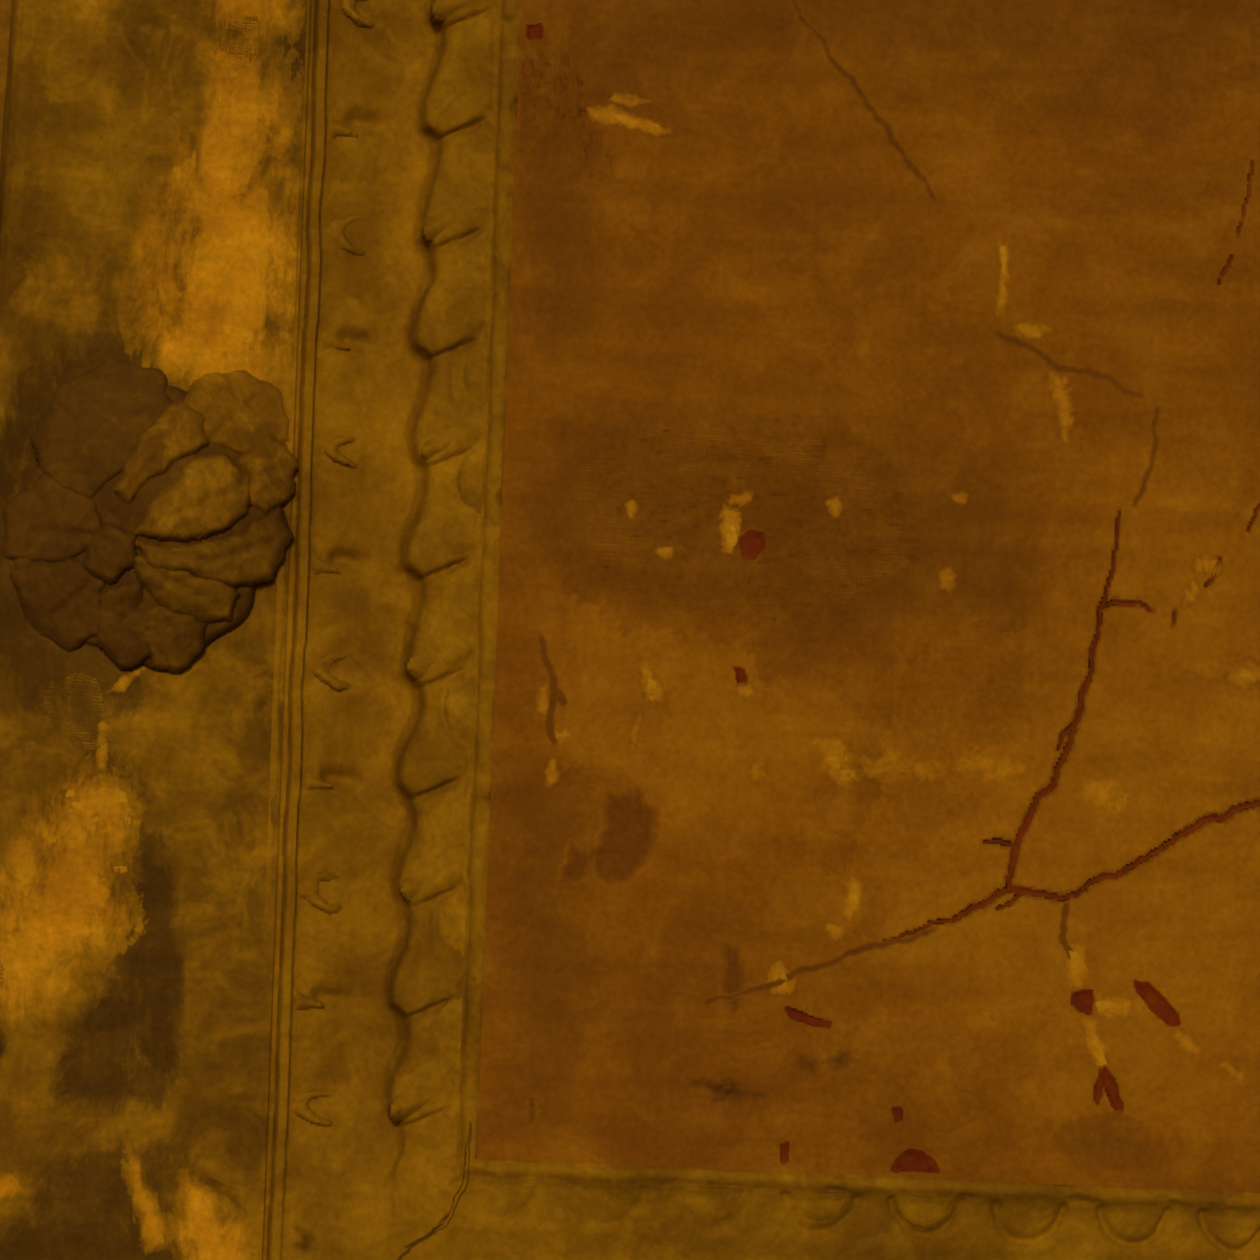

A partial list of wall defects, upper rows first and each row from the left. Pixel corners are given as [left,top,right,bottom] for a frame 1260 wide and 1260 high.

peeling [586,92,677,137]
crack [1218,161,1253,283]
peeling [718,490,766,560]
damp [479,0,1260,1189]
crack [695,330,1260,1005]
spalling [1065,940,1202,1115]